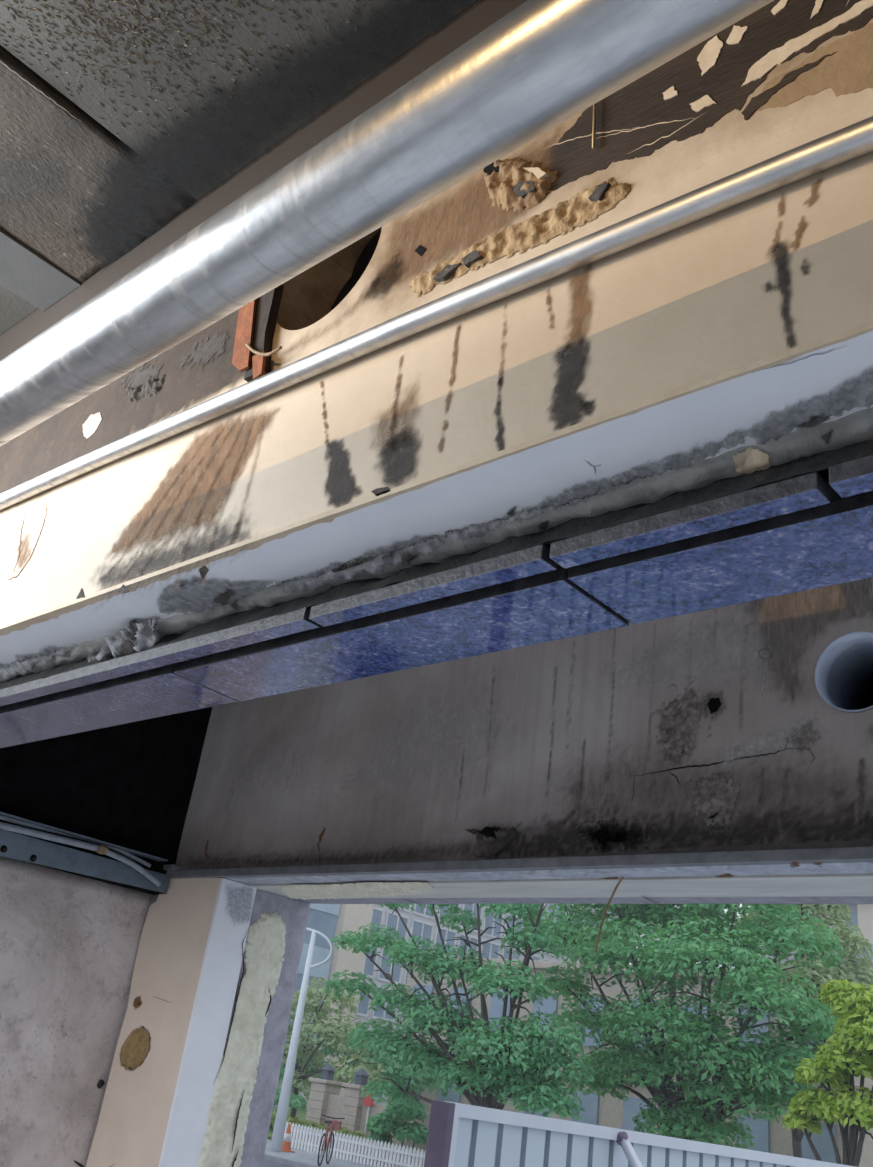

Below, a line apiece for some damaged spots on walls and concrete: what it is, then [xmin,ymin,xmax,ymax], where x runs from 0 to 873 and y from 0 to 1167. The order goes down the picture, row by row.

peeling [409,0,873,297]
water stain [766,179,821,347]
water stain [320,381,360,507]
water stain [378,356,419,486]
water stain [438,325,460,451]
water stain [494,324,505,451]
water stain [550,268,594,429]
peeling [101,634,137,662]
peeling [214,589,238,610]
peeling [332,556,373,572]
crack [630,728,815,806]
spalling [466,826,520,859]